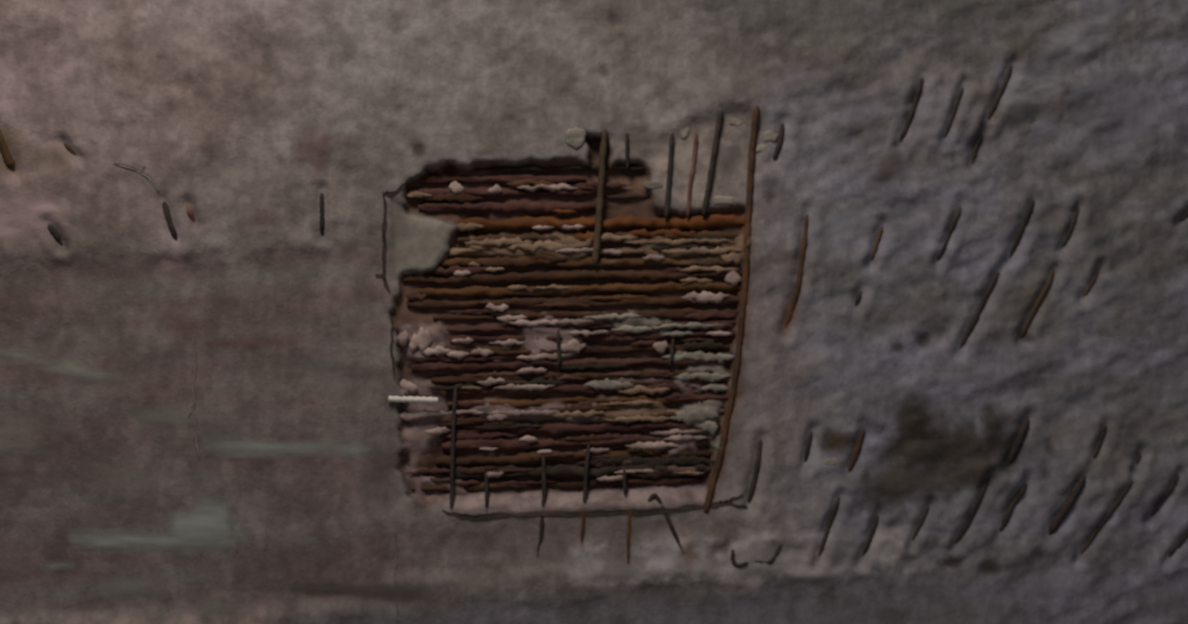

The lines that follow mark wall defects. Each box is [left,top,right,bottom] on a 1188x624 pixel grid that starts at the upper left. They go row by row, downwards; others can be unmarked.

spalling [391,105,778,564]
leakage [871,404,1012,505]